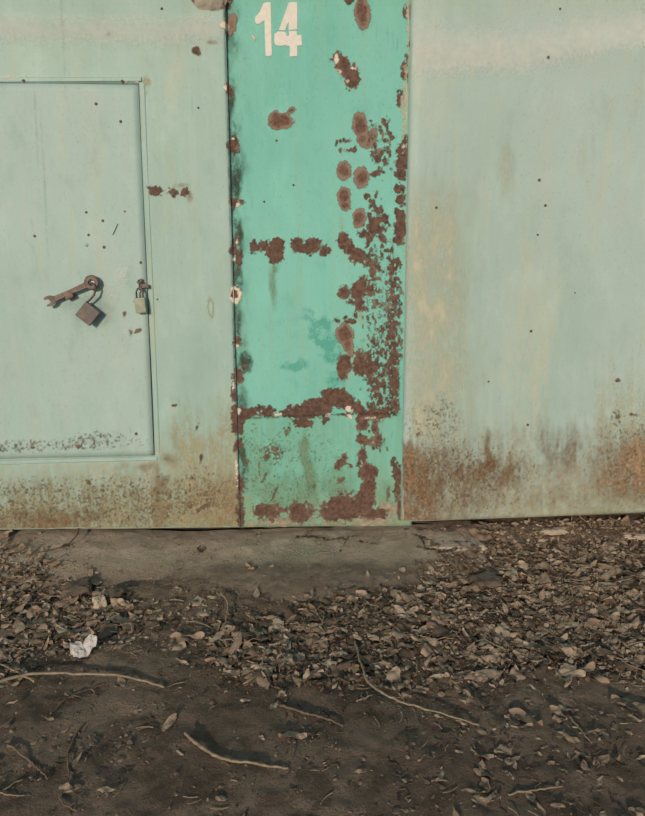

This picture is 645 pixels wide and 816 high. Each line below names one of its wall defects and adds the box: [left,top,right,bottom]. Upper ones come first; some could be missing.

peeling [226,135,240,155]
peeling [229,0,500,527]
rust [402,439,518,521]
rust [594,432,645,496]